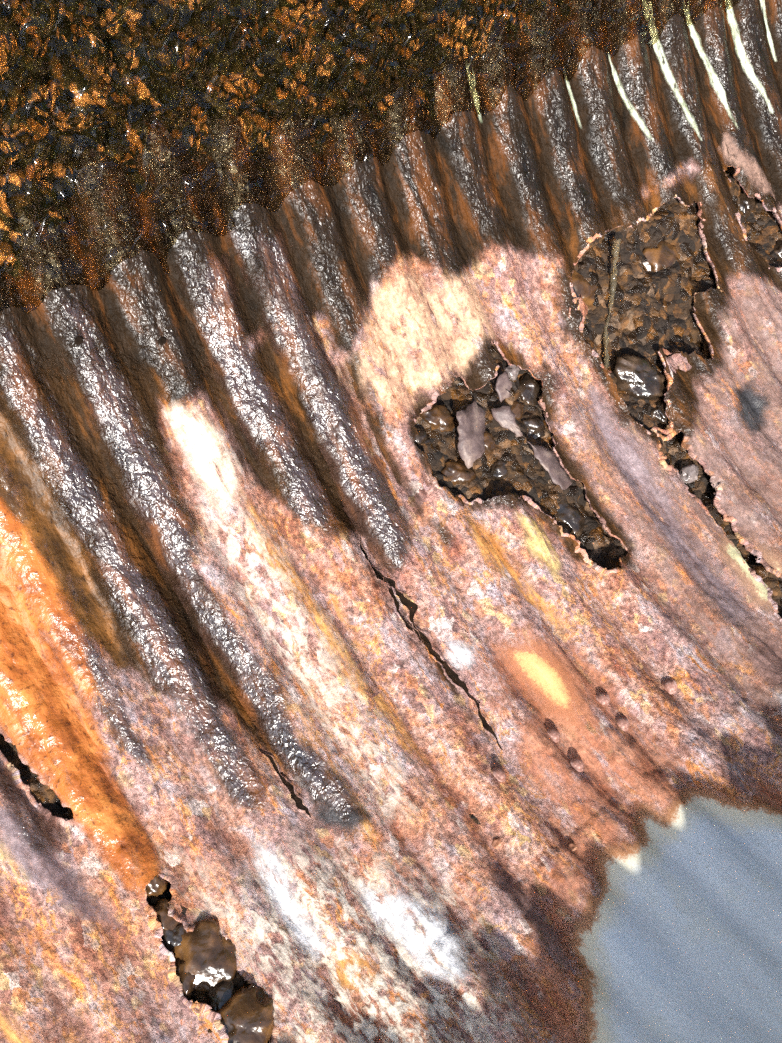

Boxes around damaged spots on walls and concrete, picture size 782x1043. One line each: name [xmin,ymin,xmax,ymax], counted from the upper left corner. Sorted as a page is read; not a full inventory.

corrosion [722,134,775,199]
peeling [568,294,588,323]
peeling [665,353,692,379]
corrosion [166,407,238,502]
peeling [456,371,572,490]
corrosion [248,507,365,689]
crack [357,531,503,750]
corrosion [469,517,559,621]
corrosion [493,634,710,946]
corrosion [334,952,372,988]